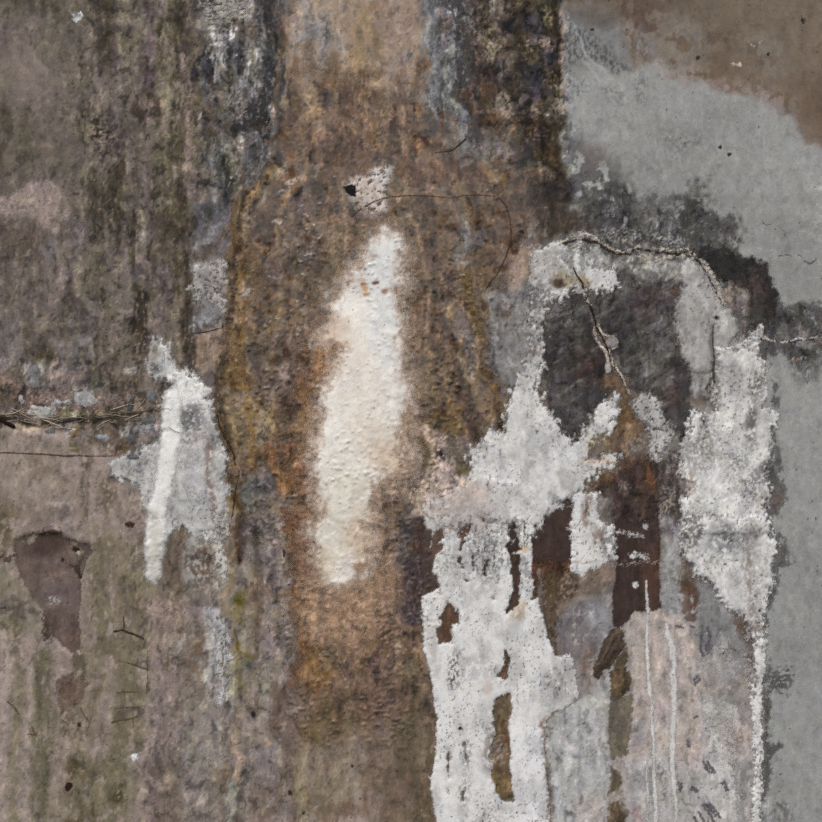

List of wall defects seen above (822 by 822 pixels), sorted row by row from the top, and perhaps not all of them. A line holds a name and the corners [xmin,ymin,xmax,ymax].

crack [560,231,726,394]
crack [705,325,822,390]
efflorescence [108,336,231,585]
spalling [3,526,92,652]
rust [256,343,339,696]
peeling [613,520,648,539]
peeling [615,551,659,567]
peeling [56,673,89,714]
efflorescence [204,604,234,707]
peeling [593,627,632,697]